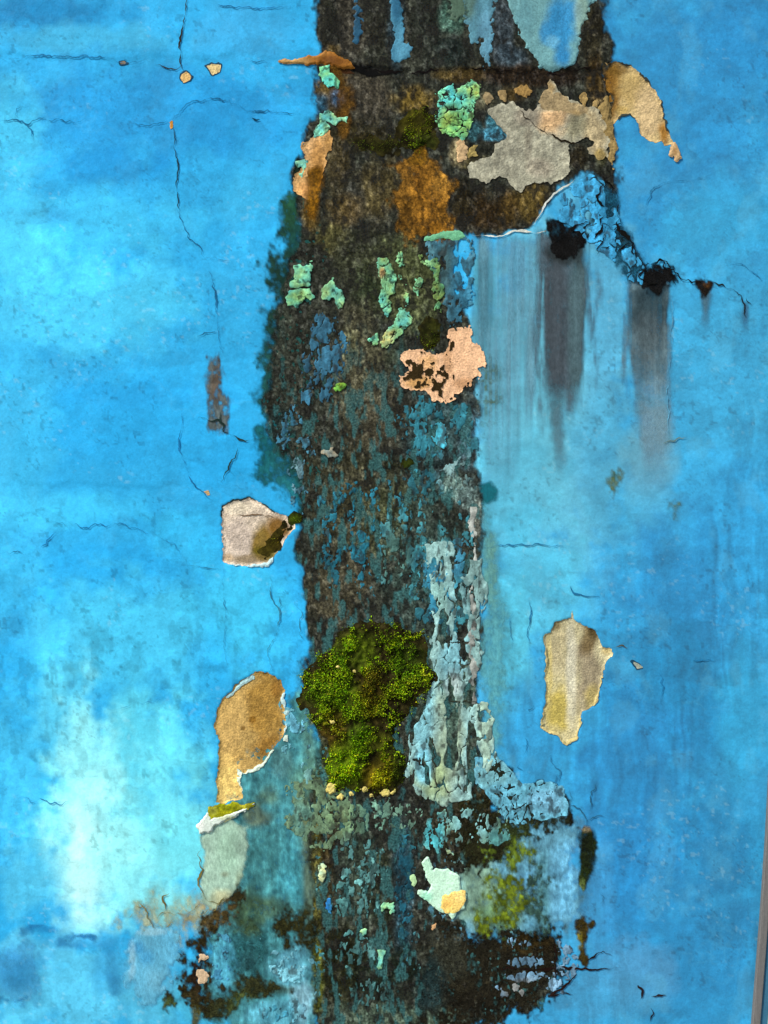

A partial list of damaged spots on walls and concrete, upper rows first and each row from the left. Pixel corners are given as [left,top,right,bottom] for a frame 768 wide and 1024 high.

crack [16,0,187,70]
crack [5,108,82,148]
rust [330,66,354,138]
crack [135,98,292,351]
rust [306,167,322,218]
rust [386,145,459,245]
crack [569,172,763,443]
crack [178,413,272,517]
damp [162,0,678,1024]
peeling [220,0,682,1011]
peeling [196,671,307,834]
peeling [259,998,306,1024]